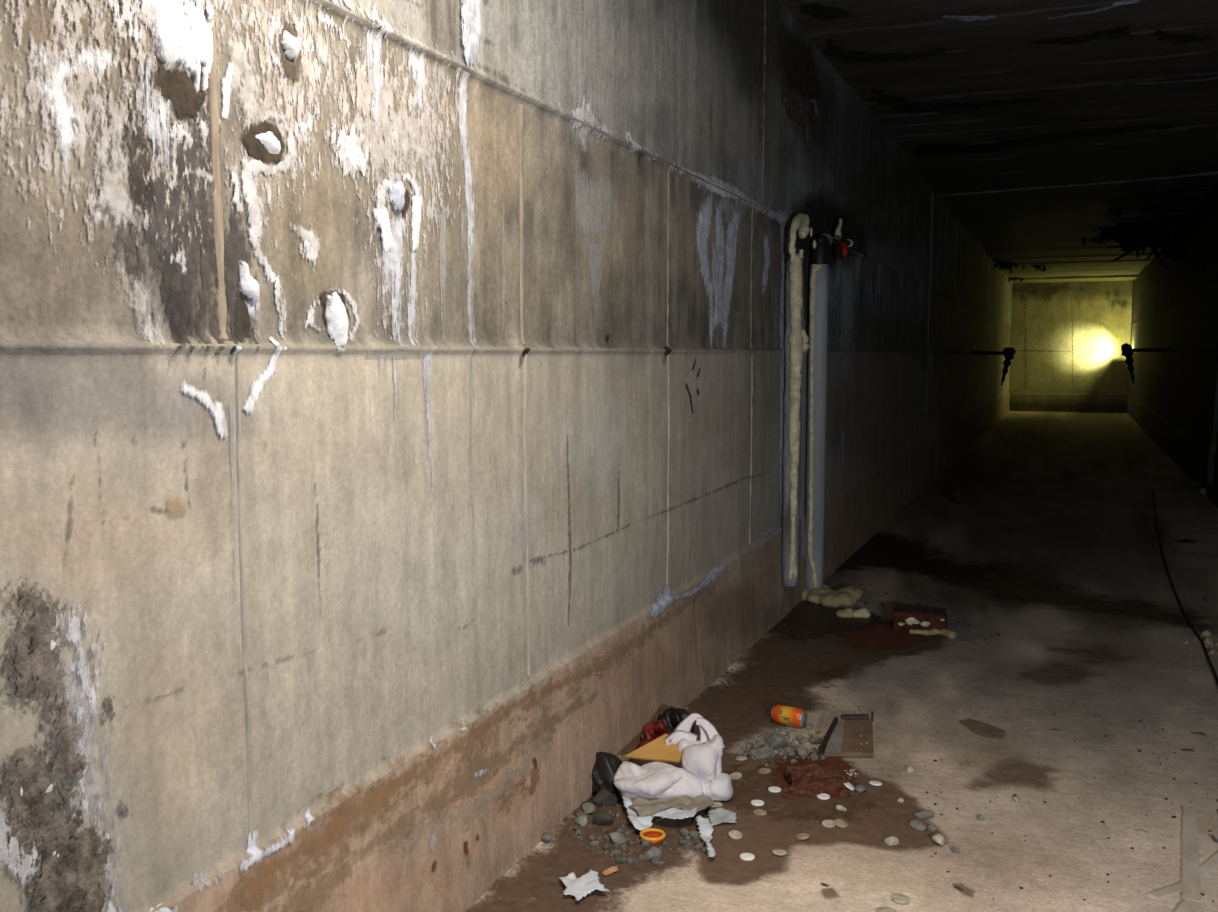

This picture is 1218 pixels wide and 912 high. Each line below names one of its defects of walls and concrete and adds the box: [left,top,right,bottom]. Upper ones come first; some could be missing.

hole [151,58,209,125]
leakage [0,0,510,485]
leakage [568,93,1218,558]
leakage [1046,0,1139,19]
spalling [0,577,132,912]
corrosion [220,589,711,912]
crack [542,435,772,626]
efflorescence [643,565,725,623]